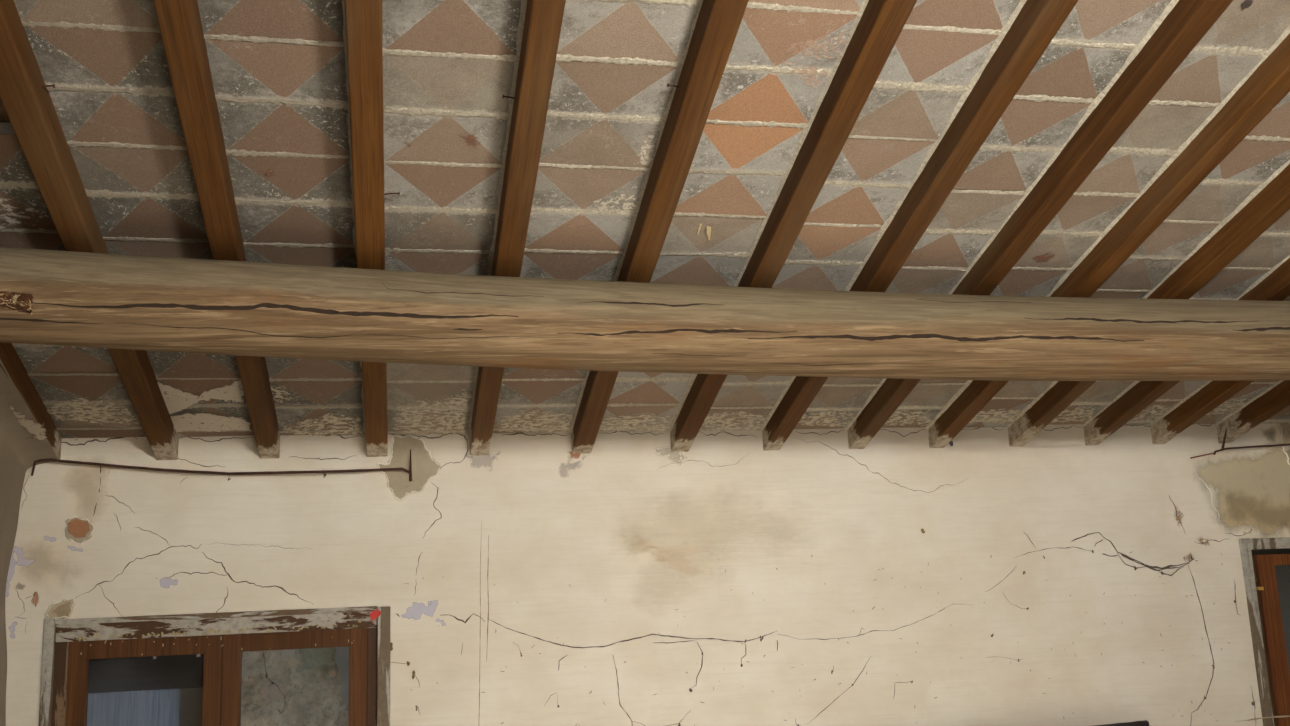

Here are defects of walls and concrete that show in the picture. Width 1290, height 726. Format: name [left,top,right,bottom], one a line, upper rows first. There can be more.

crack [61,437,137,446]
crack [178,437,255,467]
flaking render [376,434,441,502]
crack [72,495,314,617]
crack [286,433,468,617]
crack [1169,496,1247,544]